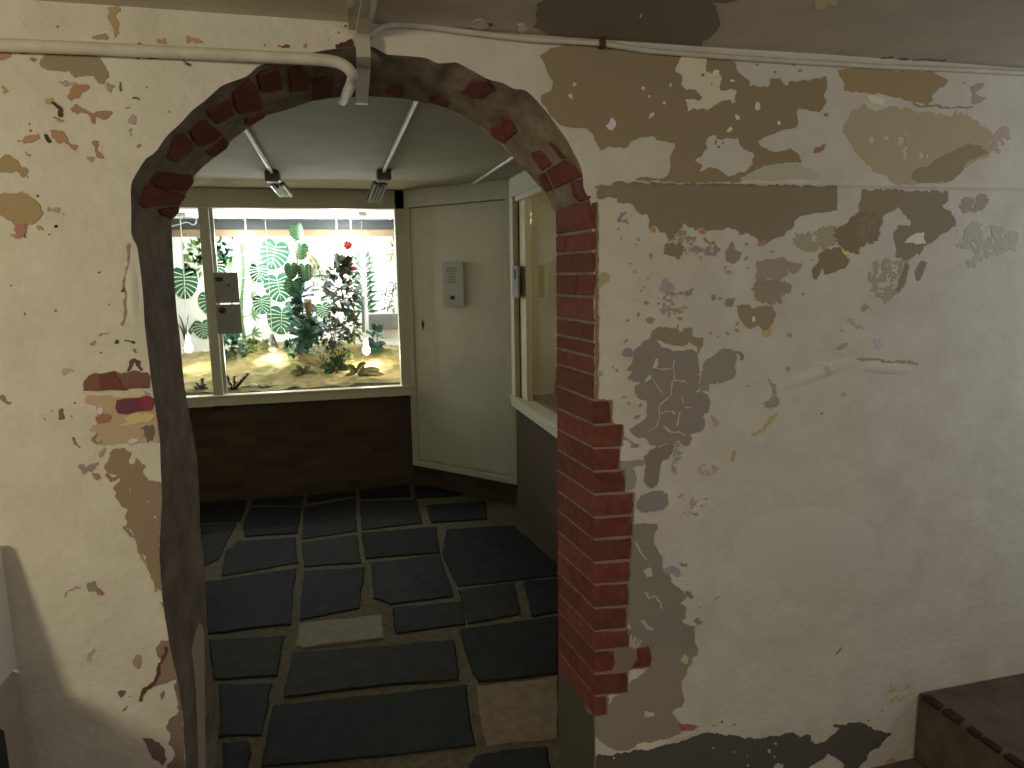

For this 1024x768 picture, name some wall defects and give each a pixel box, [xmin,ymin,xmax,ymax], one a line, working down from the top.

peeling [0,191,64,239]
peeling [78,370,165,618]
crack [623,360,700,449]
peeling [532,0,956,759]